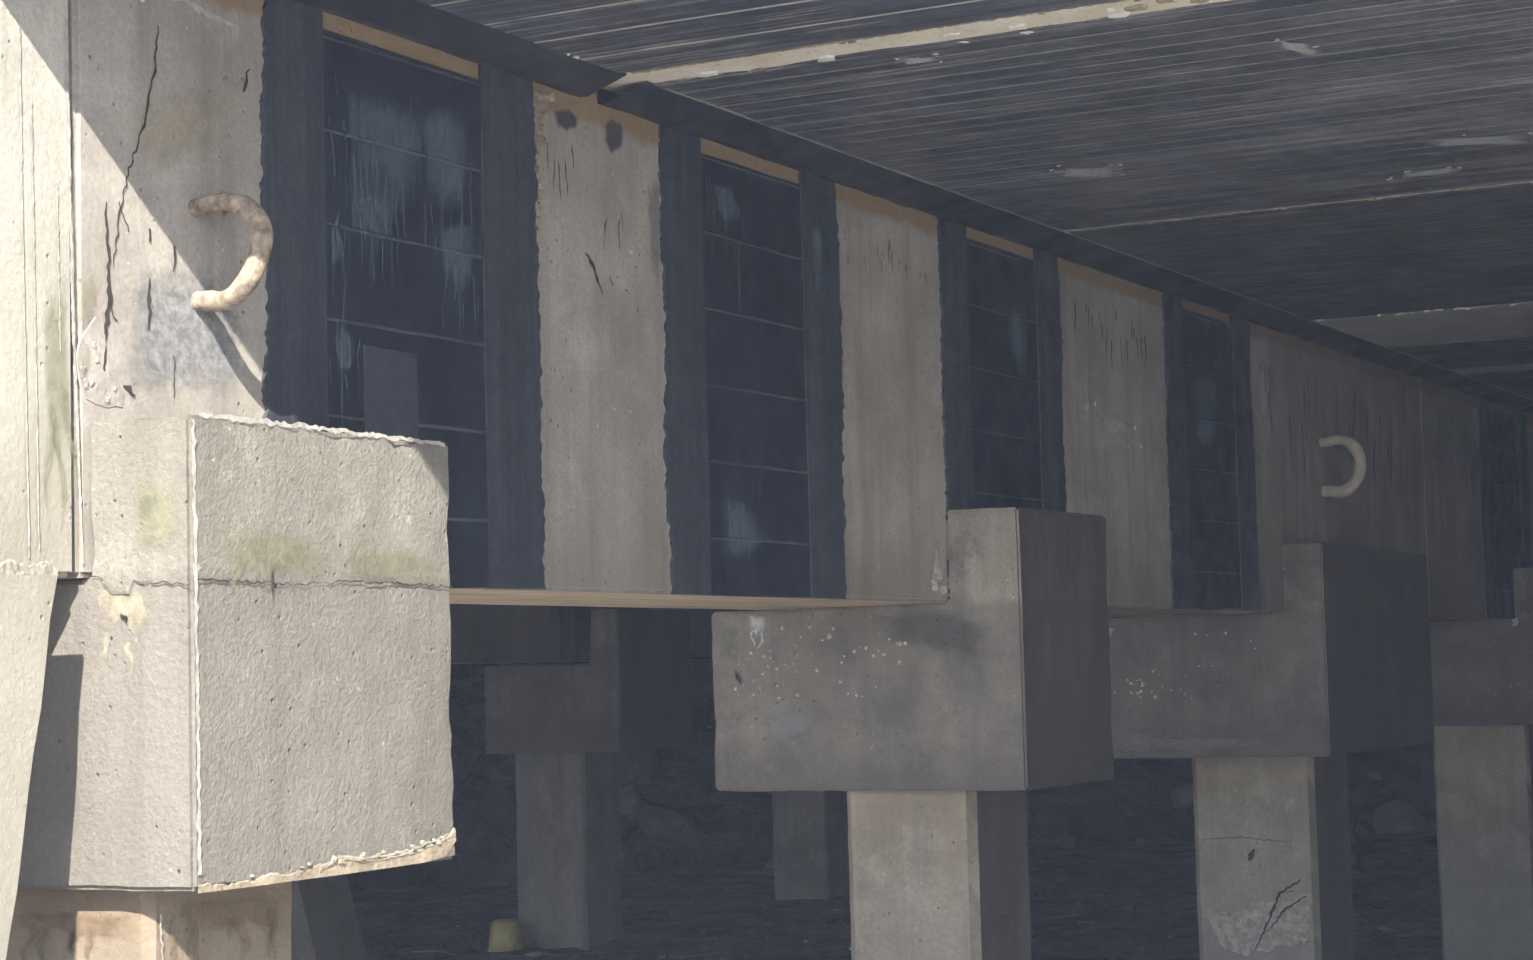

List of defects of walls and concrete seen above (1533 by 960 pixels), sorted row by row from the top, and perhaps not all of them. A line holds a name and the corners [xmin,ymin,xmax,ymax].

damp [556,110,577,130]
damp [607,122,622,152]
damp [547,143,574,199]
crack [96,25,177,398]
damp [328,76,482,428]
crack [1204,836,1292,861]
peeling [1202,893,1313,957]
crack [1254,879,1307,952]